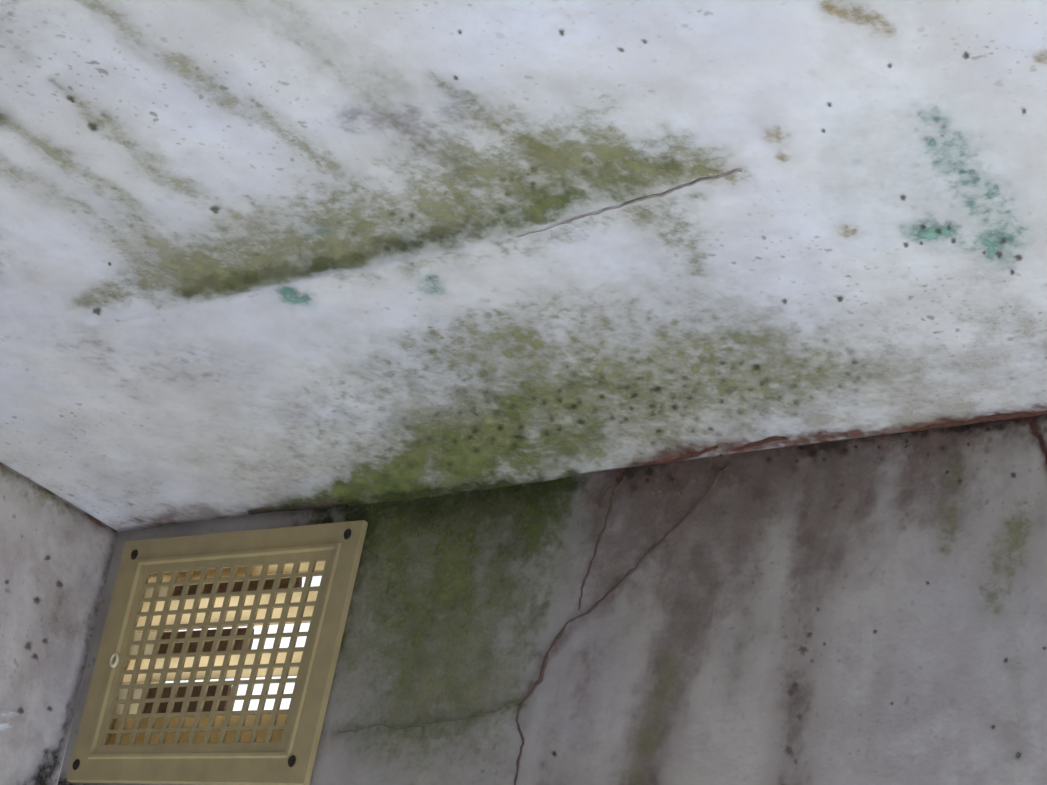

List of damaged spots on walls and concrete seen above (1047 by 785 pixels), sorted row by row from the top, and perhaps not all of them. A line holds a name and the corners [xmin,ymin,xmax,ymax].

water stain [33,140,72,168]
water stain [68,97,111,131]
water stain [279,287,311,304]
water stain [842,353,998,508]
water stain [585,390,876,646]
crack [338,463,732,785]